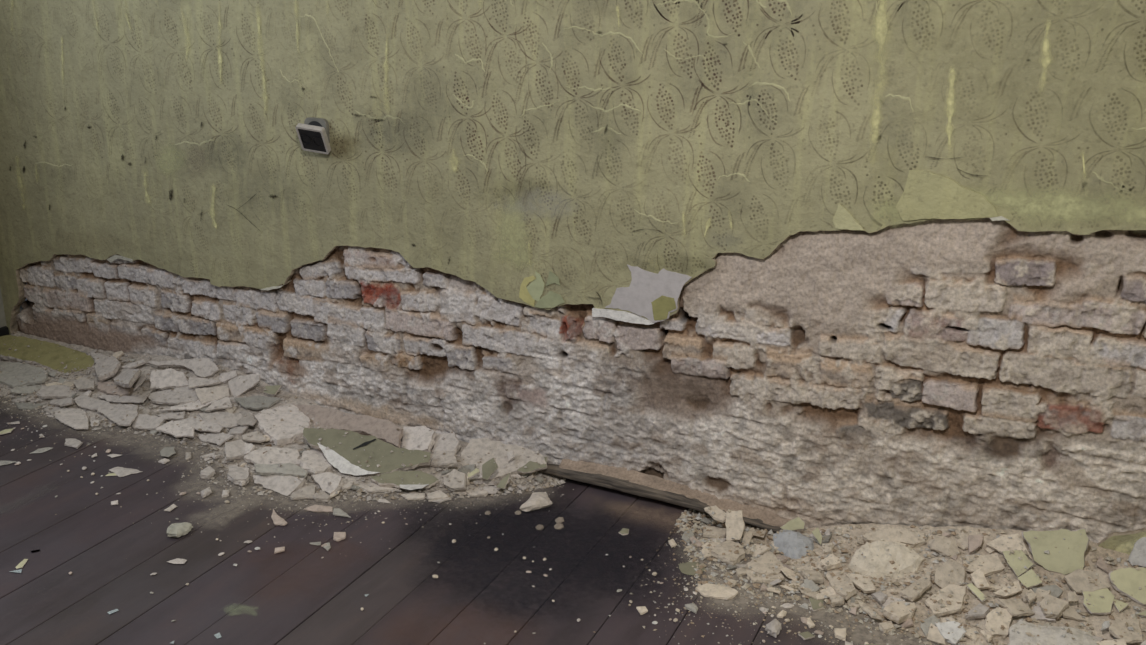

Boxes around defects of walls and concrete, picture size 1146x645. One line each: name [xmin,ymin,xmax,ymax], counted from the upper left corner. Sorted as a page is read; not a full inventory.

flaking render [10,170,1146,546]